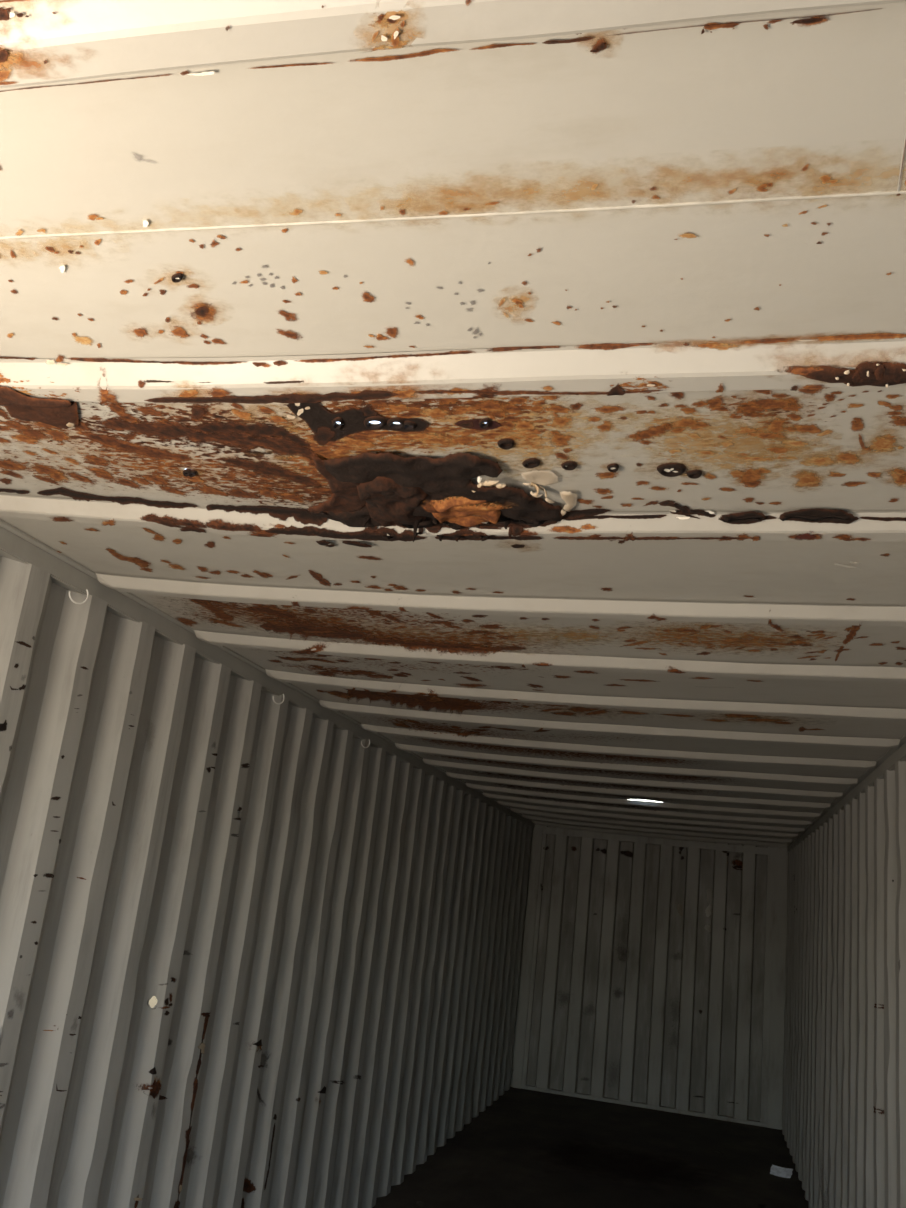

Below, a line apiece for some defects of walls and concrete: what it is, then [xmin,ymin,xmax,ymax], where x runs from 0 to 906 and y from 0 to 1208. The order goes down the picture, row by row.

rust [0,8,29,20]
rust [365,10,421,51]
rust [0,47,47,85]
rust [16,229,101,254]
rust [143,271,199,296]
rust [133,303,226,344]
rust [277,277,302,340]
rust [364,328,397,348]
rust [0,376,906,508]
peeling [521,470,578,516]
rust [106,548,426,592]
rust [168,598,906,828]